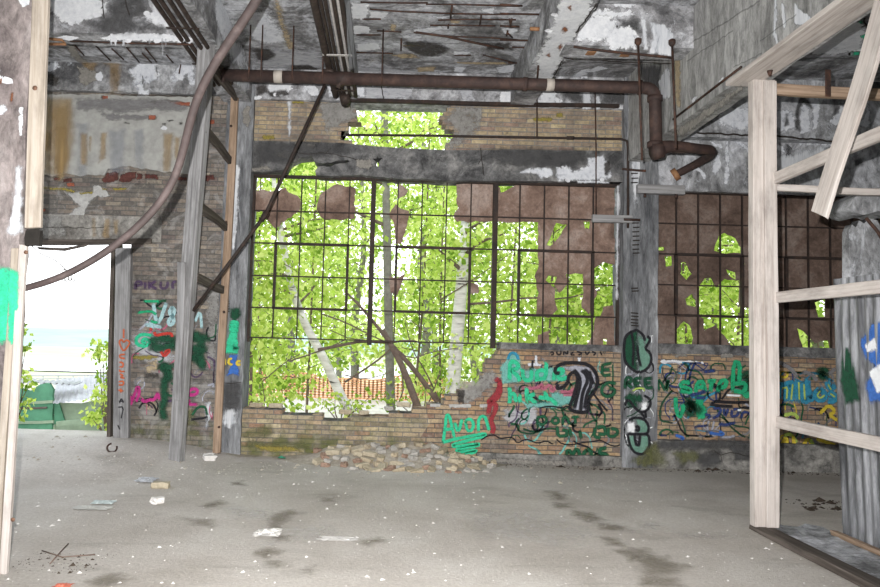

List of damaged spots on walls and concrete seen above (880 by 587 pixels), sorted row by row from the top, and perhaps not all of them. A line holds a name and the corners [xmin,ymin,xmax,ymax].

peeling [50,0,193,86]
spalling [351,1,539,64]
peeling [534,0,671,78]
spalling [102,171,158,183]
damp [577,512,676,585]